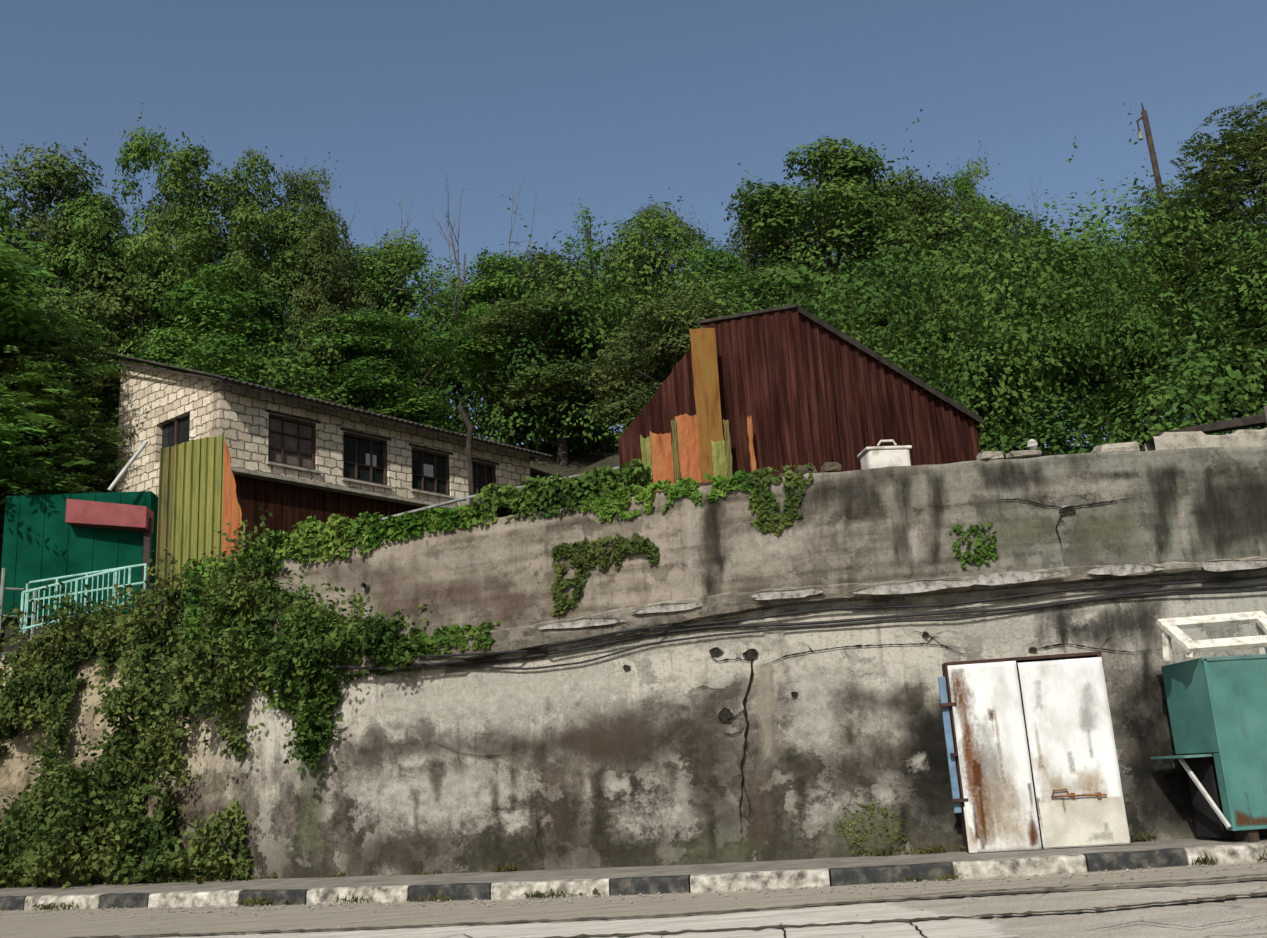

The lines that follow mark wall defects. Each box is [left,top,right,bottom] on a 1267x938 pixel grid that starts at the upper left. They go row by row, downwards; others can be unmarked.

water stain [794,476,909,510]
water stain [898,475,942,561]
water stain [983,465,1041,489]
crack [987,496,1142,548]
water stain [1150,467,1267,560]
water stain [359,692,734,840]
crack [689,630,992,851]
corrosion [953,672,1041,848]